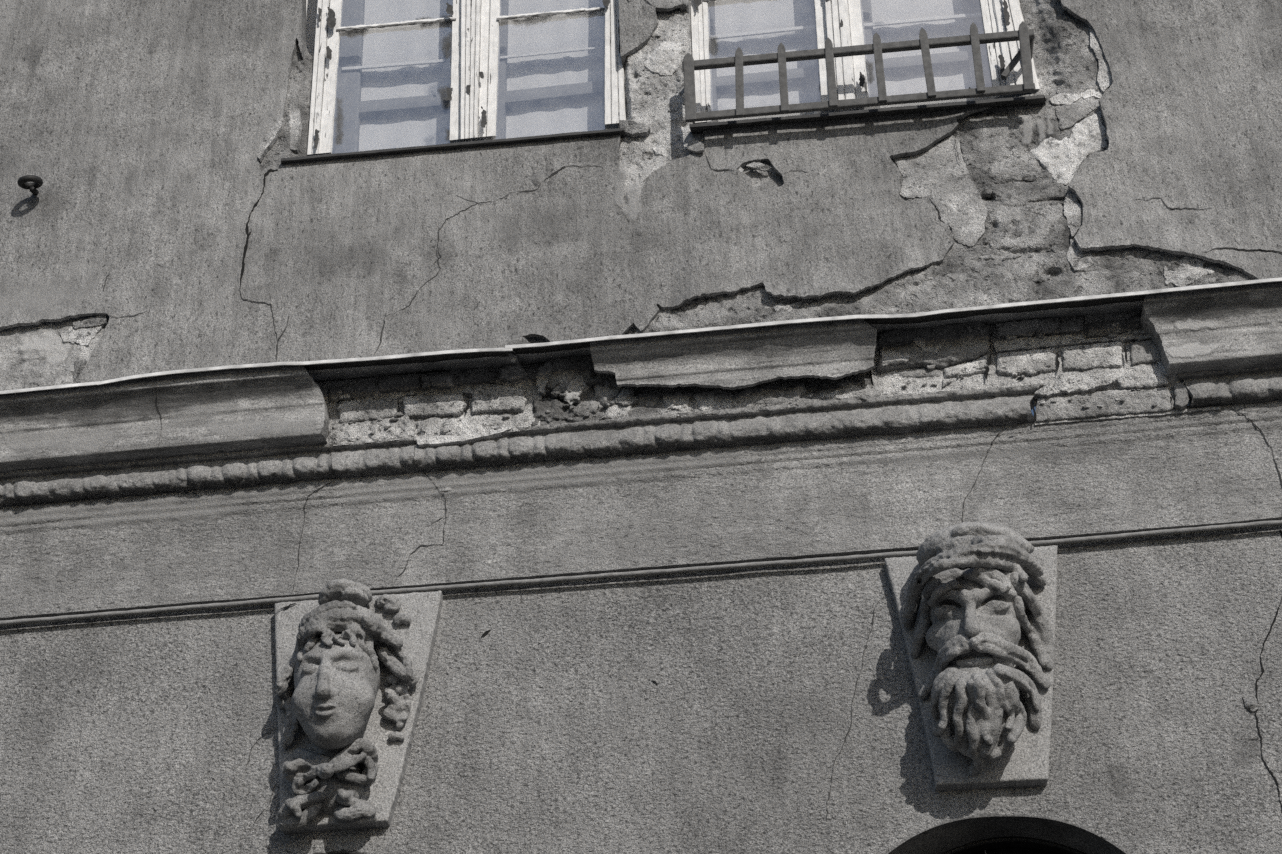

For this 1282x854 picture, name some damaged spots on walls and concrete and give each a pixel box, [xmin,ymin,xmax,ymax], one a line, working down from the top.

spalling [258,44,332,172]
spalling [0,315,110,391]
crack [237,165,289,359]
crack [373,165,596,356]
spalling [315,0,1254,448]
crack [1235,410,1282,535]
crack [1242,597,1282,807]